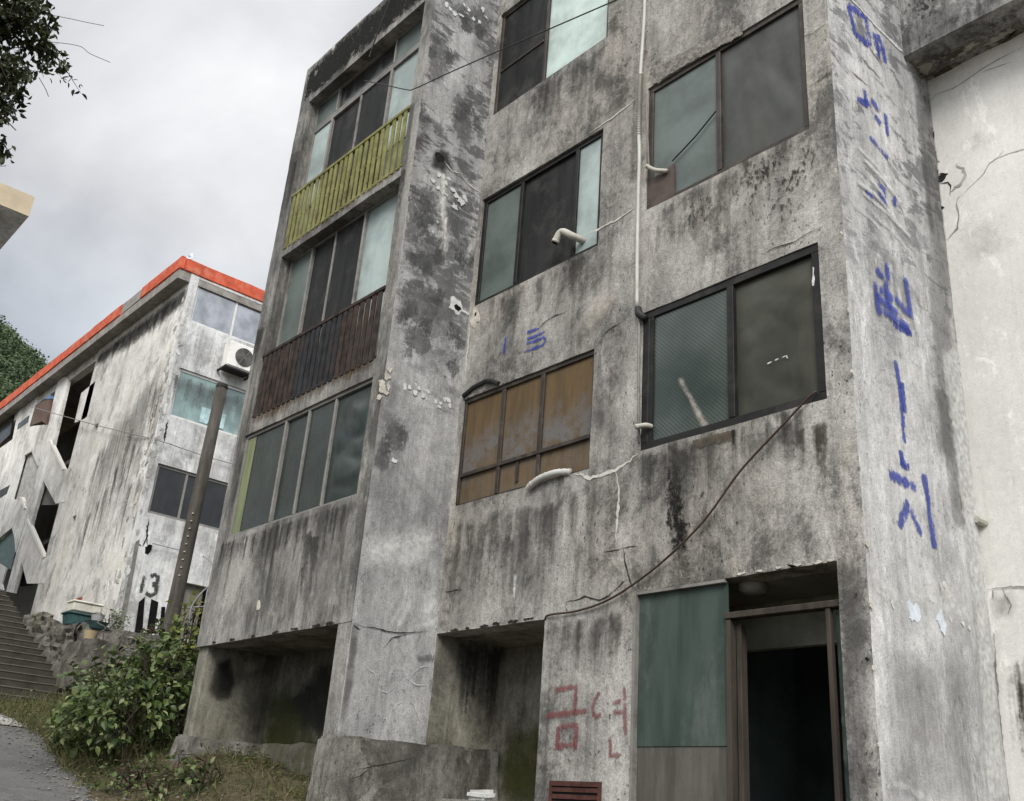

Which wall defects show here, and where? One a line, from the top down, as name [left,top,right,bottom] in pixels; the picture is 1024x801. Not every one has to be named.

flaking render [445,2,488,24]
flaking render [414,173,468,235]
crack [939,149,1023,240]
peeling [448,296,480,328]
flaking render [377,366,392,400]
flaking render [403,383,451,409]
leakage [642,442,690,558]
crack [139,521,152,554]
crack [565,453,638,611]
crack [354,625,427,649]